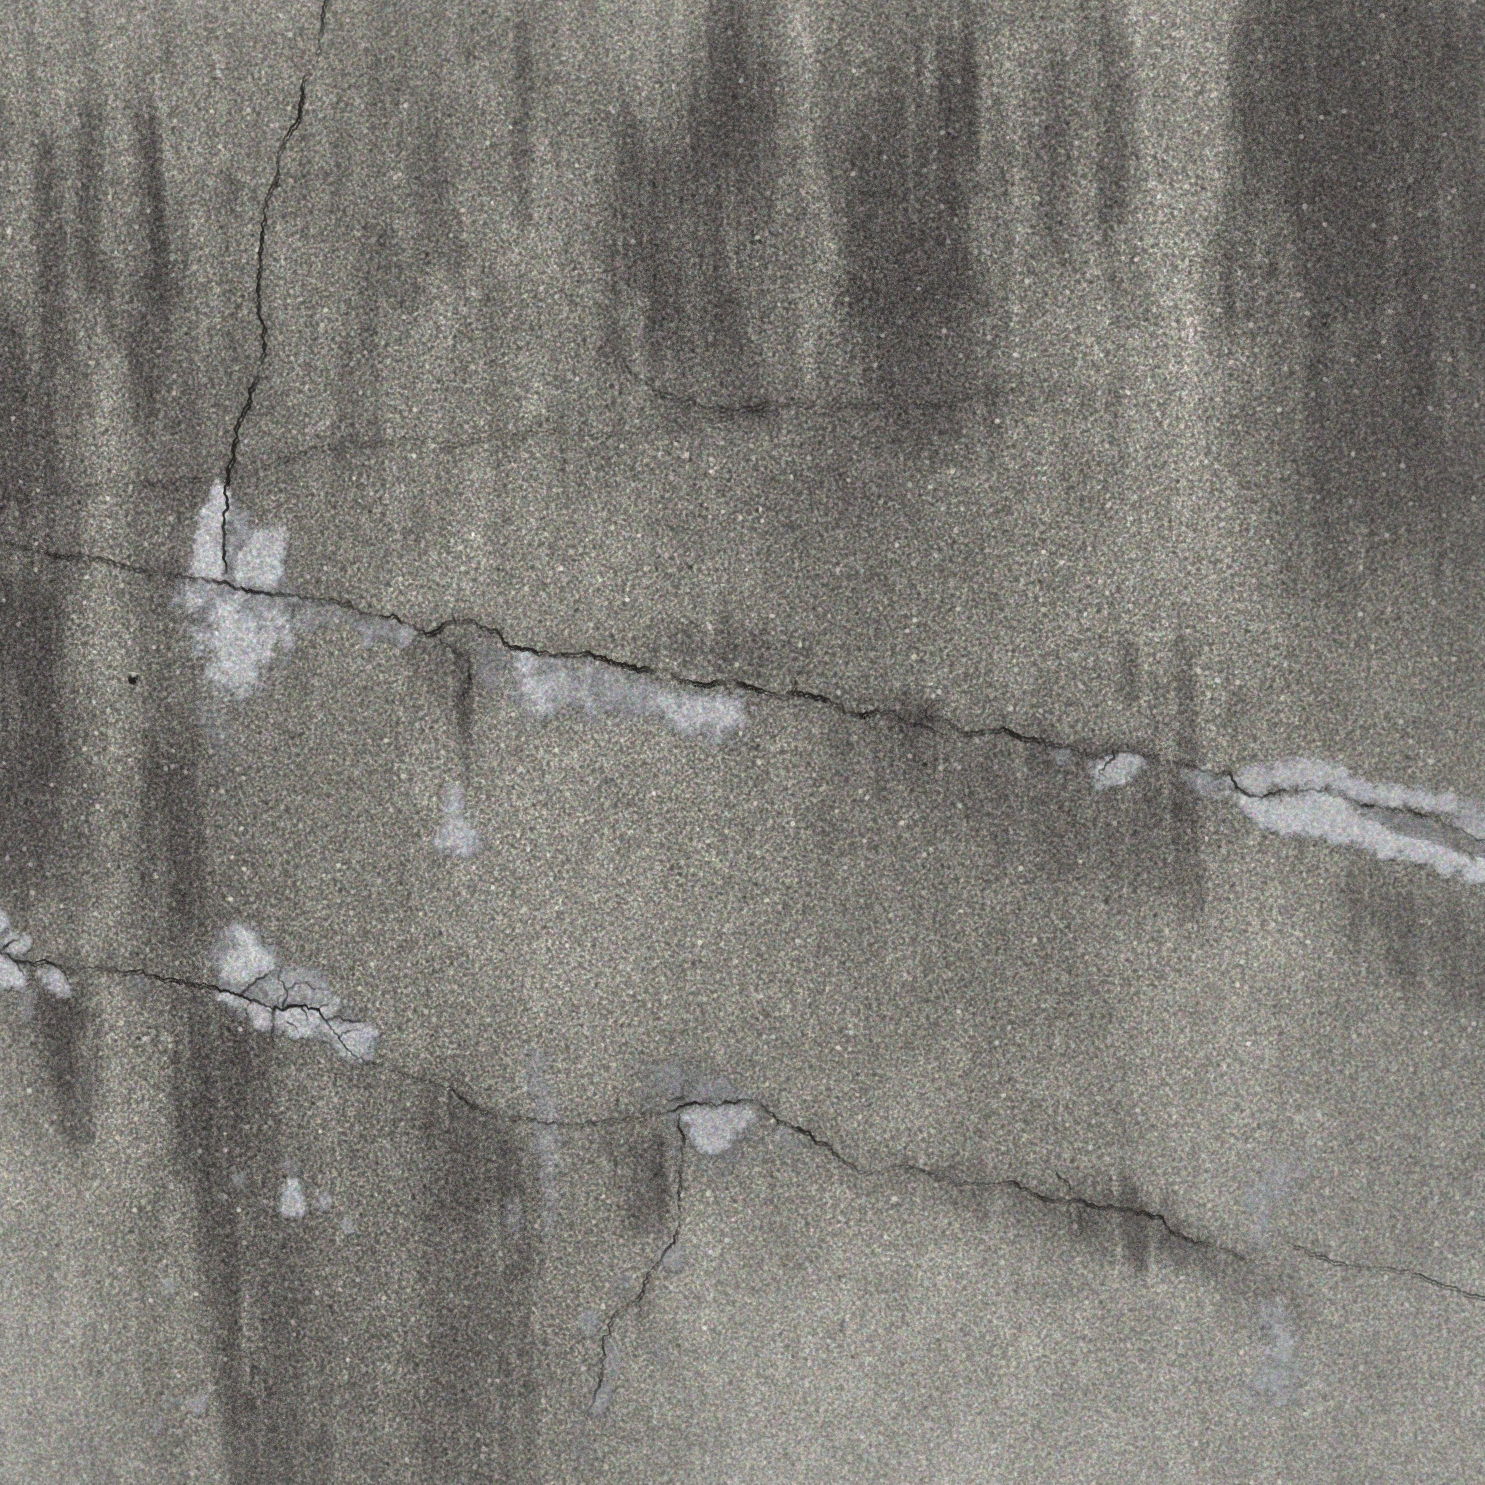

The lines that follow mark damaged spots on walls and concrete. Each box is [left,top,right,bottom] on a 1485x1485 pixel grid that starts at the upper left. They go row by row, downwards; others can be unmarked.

leakage [650,16,739,351]
leakage [856,33,972,448]
leakage [1301,0,1434,550]
crack [43,0,1147,771]
leakage [505,650,748,745]
crack [1218,770,1283,798]
crack [0,939,361,1051]
leakage [679,1104,756,1155]
crack [405,1073,925,1395]
crack [987,1170,1241,1257]
crack [1293,1245,1348,1266]
crack [1405,1269,1485,1298]